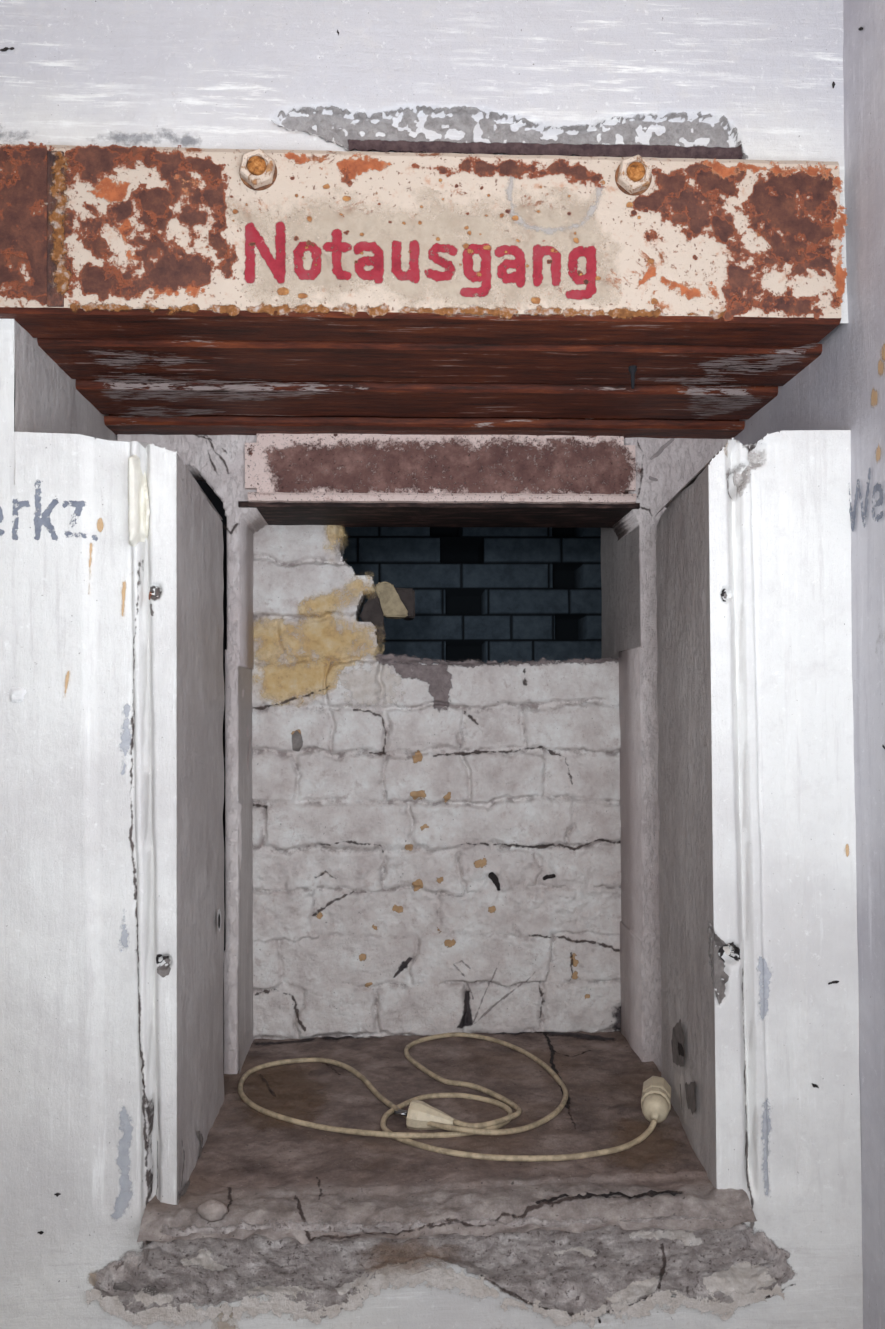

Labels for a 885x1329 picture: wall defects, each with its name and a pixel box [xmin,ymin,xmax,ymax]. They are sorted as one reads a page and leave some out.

spalling [278,106,748,160]
rust [0,141,848,323]
rust [263,436,640,494]
peeling [376,653,619,711]
crack [353,709,386,755]
crack [433,711,573,784]
crack [313,841,384,916]
crack [461,839,621,850]
crack [532,934,620,1129]
crack [294,1177,683,1242]
peeling [89,1215,794,1321]
crack [480,1243,673,1316]